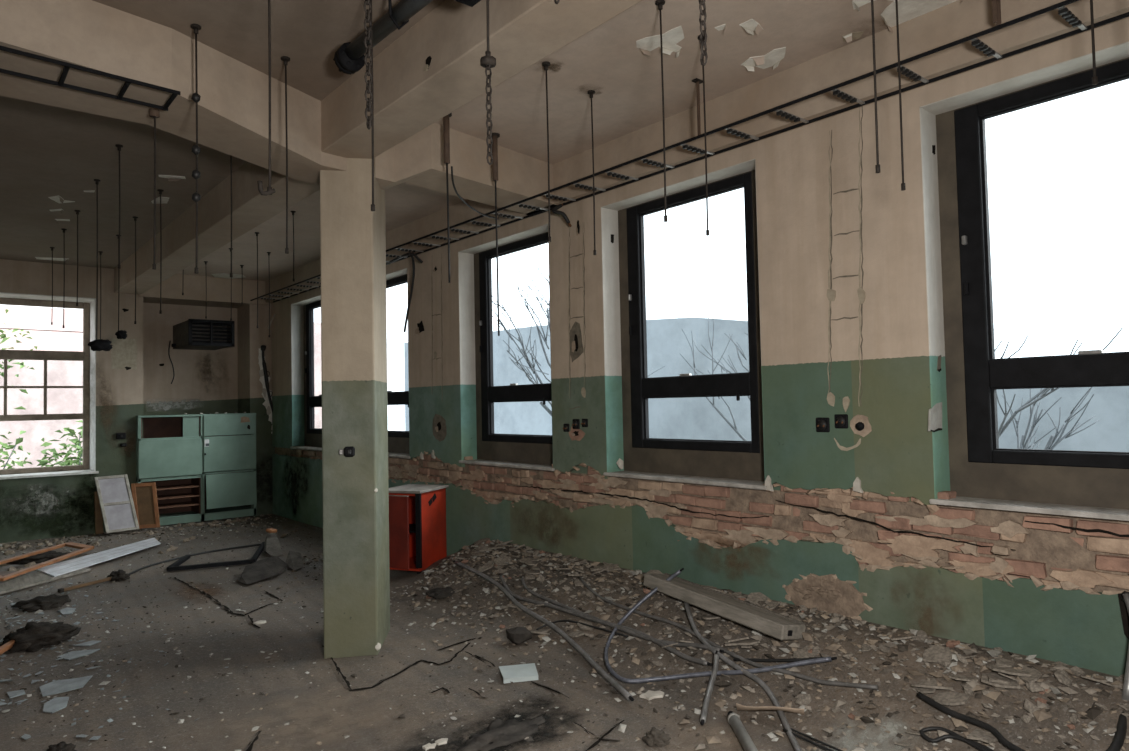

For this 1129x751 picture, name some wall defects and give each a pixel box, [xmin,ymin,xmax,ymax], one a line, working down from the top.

peeling [852,0,963,33]
peeling [636,26,684,58]
peeling [741,47,786,71]
damp [0,474,97,536]
spalling [388,414,1129,621]